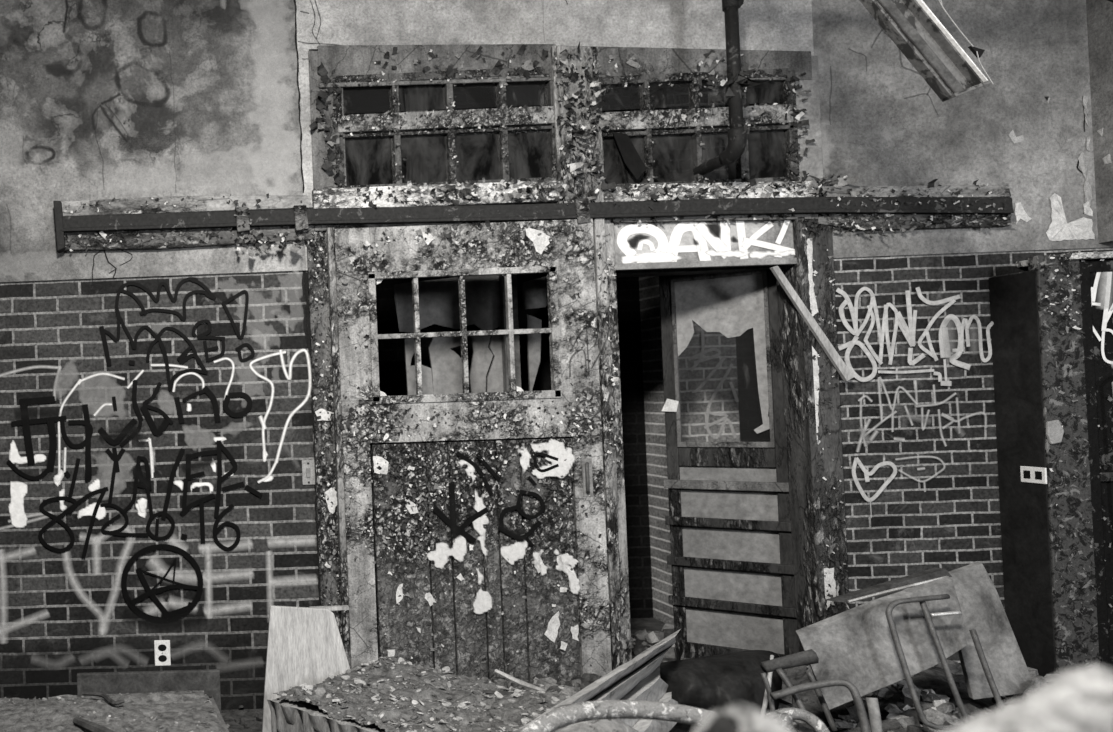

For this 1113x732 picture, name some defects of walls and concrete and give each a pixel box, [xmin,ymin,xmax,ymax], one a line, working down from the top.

damp [0,0,177,153]
spalling [1040,95,1104,335]
peeling [65,42,1032,672]